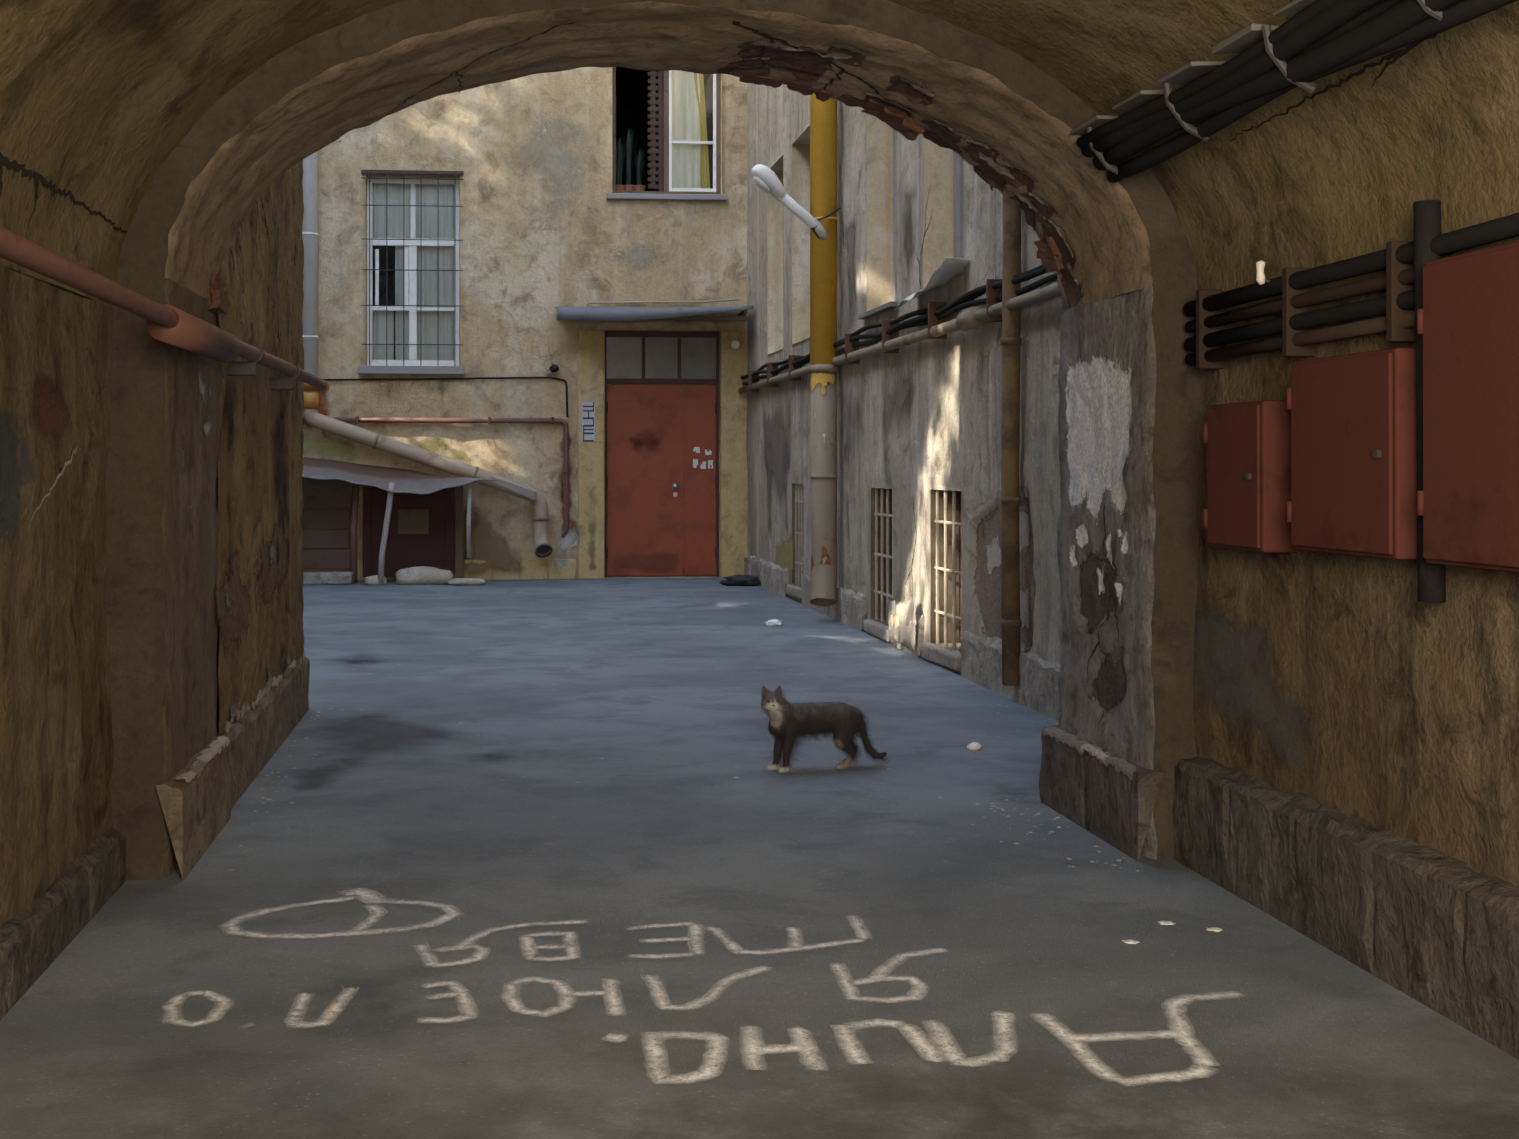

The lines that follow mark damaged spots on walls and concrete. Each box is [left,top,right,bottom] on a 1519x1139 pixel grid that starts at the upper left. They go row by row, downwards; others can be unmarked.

crack [0,152,127,233]
spalling [964,491,1002,639]
spalling [1019,487,1035,652]
peeling [1064,356,1133,635]
spalling [176,651,305,783]